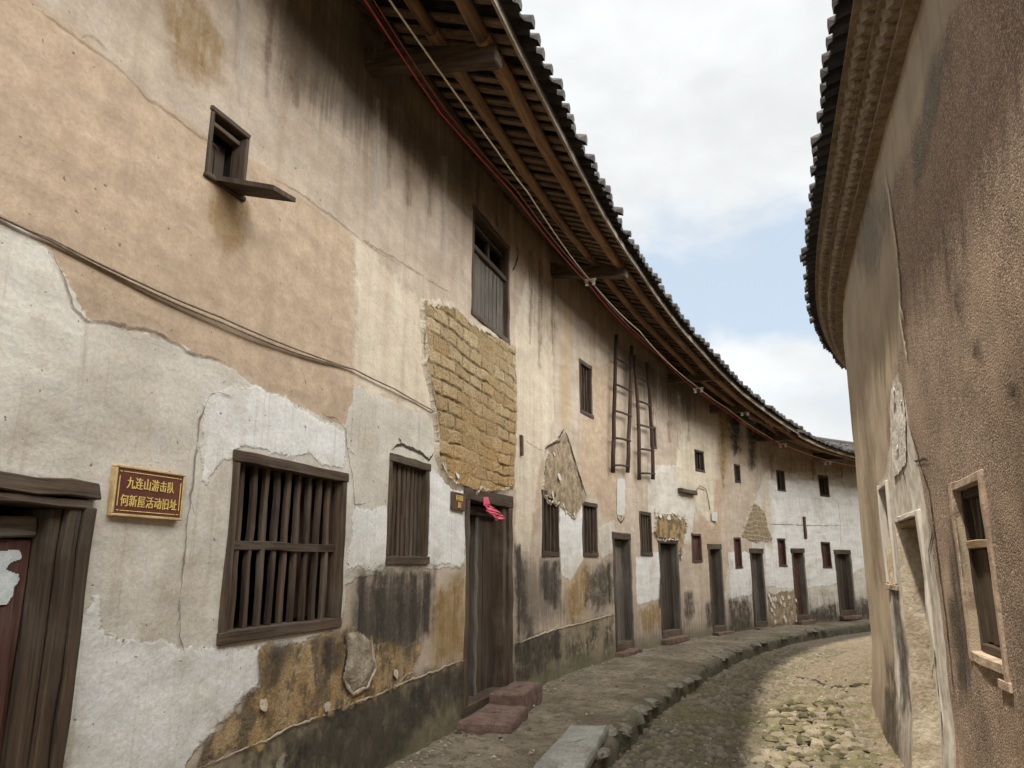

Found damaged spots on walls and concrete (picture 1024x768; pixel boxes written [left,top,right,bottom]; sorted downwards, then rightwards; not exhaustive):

crack [177,392,230,654]
flaking render [419,297,518,495]
peeling [542,431,585,520]
peeling [653,508,688,561]
peeling [741,502,772,544]
peeling [890,380,906,479]
leakage [325,571,430,681]
leakage [514,545,561,681]
leakage [585,564,613,611]
peeling [767,590,797,625]
leakage [284,664,464,768]